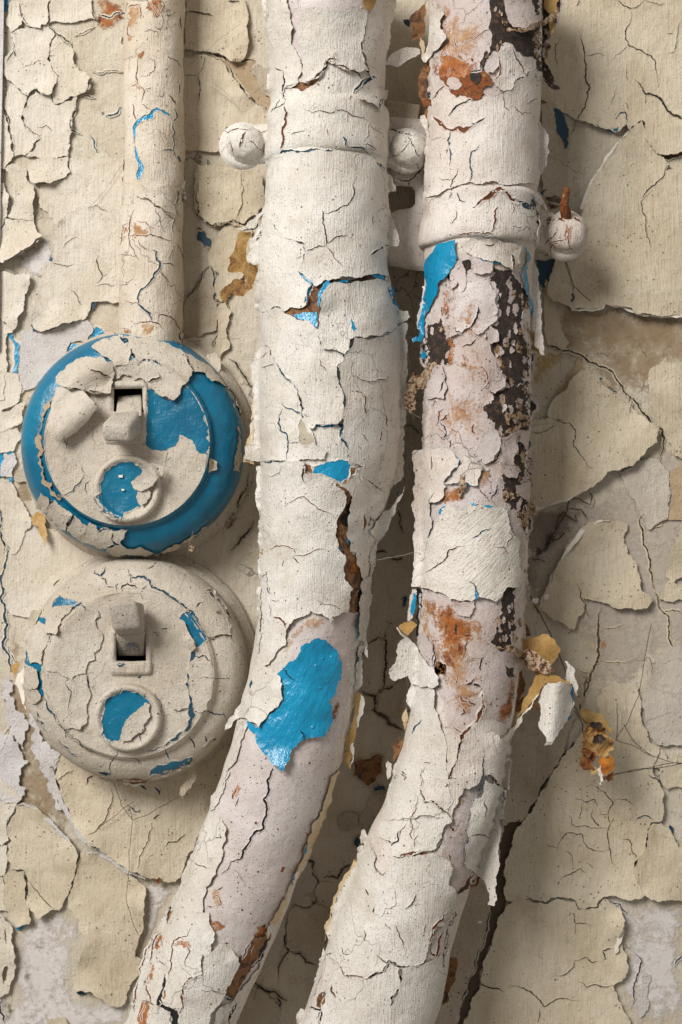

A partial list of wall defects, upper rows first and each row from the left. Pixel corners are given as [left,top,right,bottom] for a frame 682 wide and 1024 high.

peeling [0,0,124,482]
peeling [183,0,267,154]
crack [3,29,582,389]
rust [433,0,563,100]
crack [553,0,682,135]
crack [640,150,682,251]
peeling [0,150,410,1024]
rust [407,589,488,707]
peeling [262,0,682,1024]
rust [419,256,539,541]
rust [486,586,531,652]
crack [458,742,644,1024]